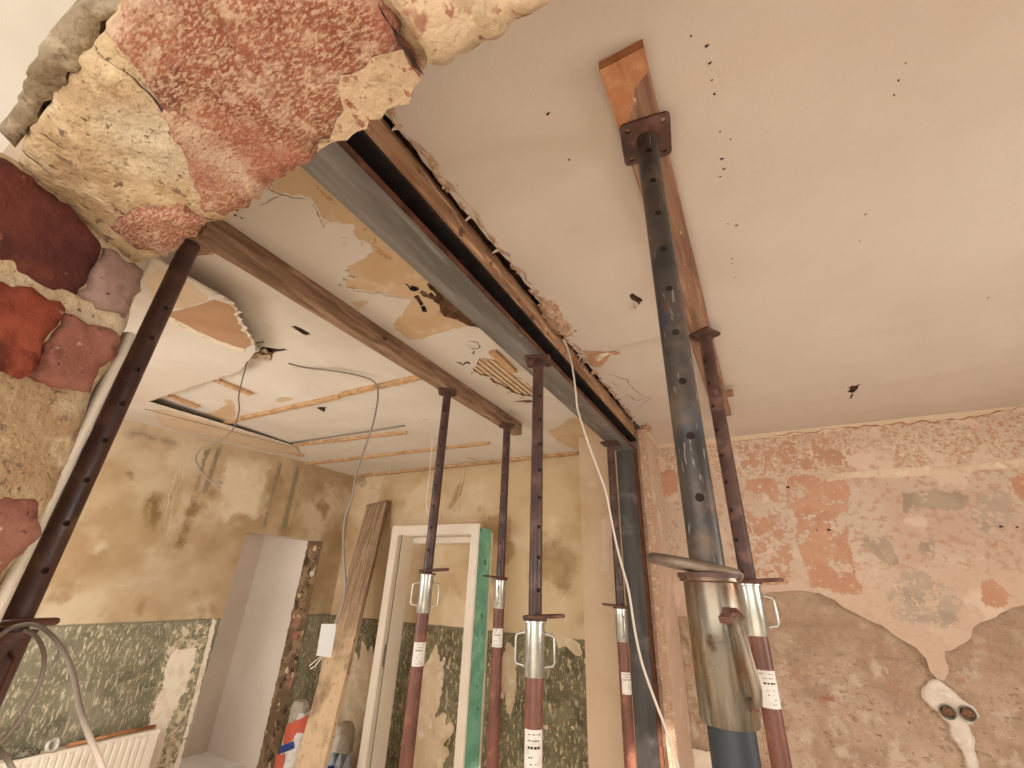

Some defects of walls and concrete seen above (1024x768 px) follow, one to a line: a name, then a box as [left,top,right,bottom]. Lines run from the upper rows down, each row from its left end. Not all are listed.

flaking render [0,0,122,147]
peeling [272,166,467,340]
damp [141,490,164,532]
damp [173,445,222,549]
damp [262,462,301,530]
flaking render [386,107,679,768]
flaking render [738,438,1024,768]
peeling [148,619,217,768]
flaking render [678,616,710,752]